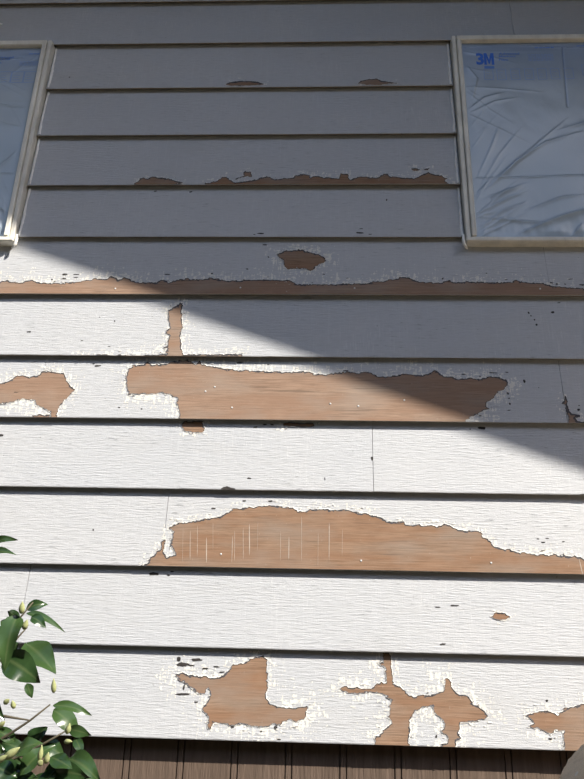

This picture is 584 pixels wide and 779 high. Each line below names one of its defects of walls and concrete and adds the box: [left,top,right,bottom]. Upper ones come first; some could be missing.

peeling [225,77,268,86]
peeling [134,174,192,193]
peeling [196,164,456,184]
peeling [0,240,584,439]
peeling [139,500,584,576]
peeling [155,648,584,751]